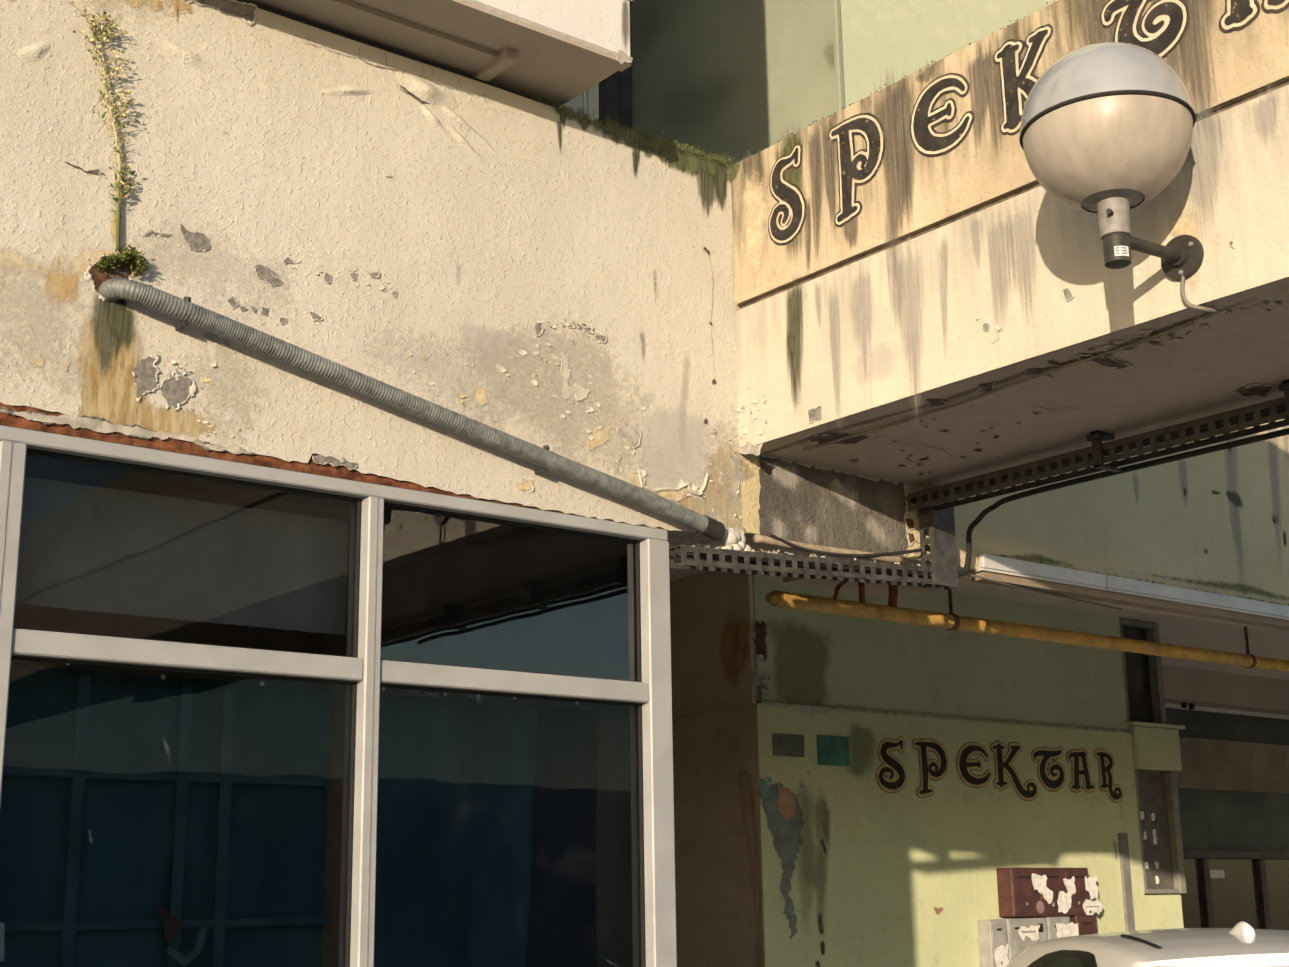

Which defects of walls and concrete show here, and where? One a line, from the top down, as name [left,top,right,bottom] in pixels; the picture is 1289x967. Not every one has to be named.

spalling [129,0,259,26]
water stain [1081,0,1115,45]
water stain [969,45,1003,139]
peeling [180,223,210,251]
water stain [633,138,752,213]
water stain [776,119,857,264]
water stain [875,68,931,252]
water stain [94,296,132,370]
spalling [0,407,168,440]
peeling [132,353,255,454]
peeling [571,387,931,564]
peeling [758,771,811,940]